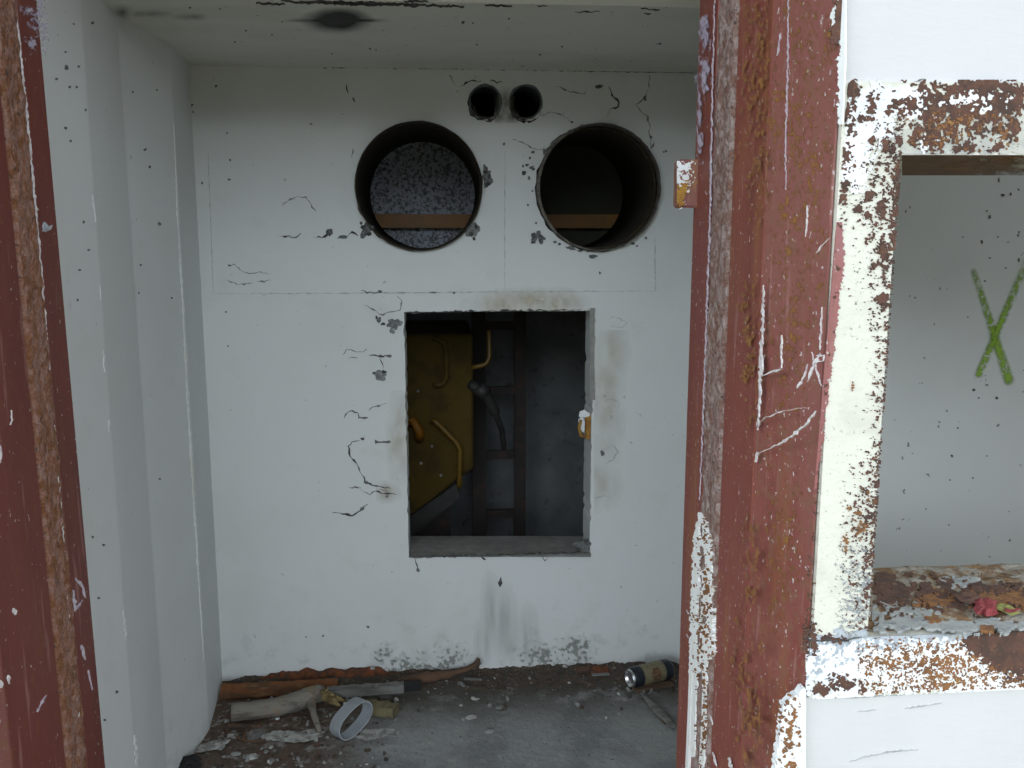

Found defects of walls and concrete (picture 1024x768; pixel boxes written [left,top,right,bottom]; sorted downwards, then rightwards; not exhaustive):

crack [449,69,687,149]
spalling [482,164,493,188]
spalling [522,124,583,206]
crack [208,155,656,316]
spalling [465,222,480,240]
crack [343,349,392,368]
rust [729,0,1024,768]
crack [333,403,397,517]
rust [261,666,400,680]